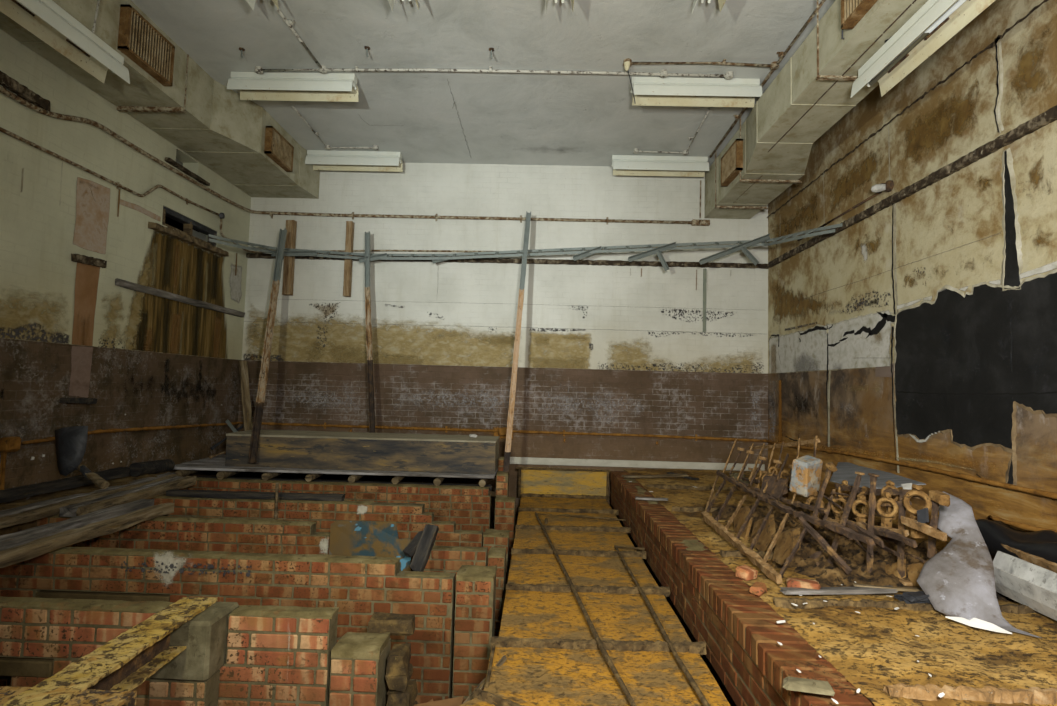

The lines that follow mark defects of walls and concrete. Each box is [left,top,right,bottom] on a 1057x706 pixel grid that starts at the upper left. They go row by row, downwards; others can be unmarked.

corrosion [905,81,979,163]
corrosion [831,152,881,212]
corrosion [1029,160,1050,191]
corrosion [773,195,817,245]
corrosion [855,235,880,260]
leakage [0,297,69,344]
leakage [244,302,515,367]
leakage [529,306,763,373]
crack [768,203,899,473]
mould [842,292,891,314]
peeling [769,261,1057,453]